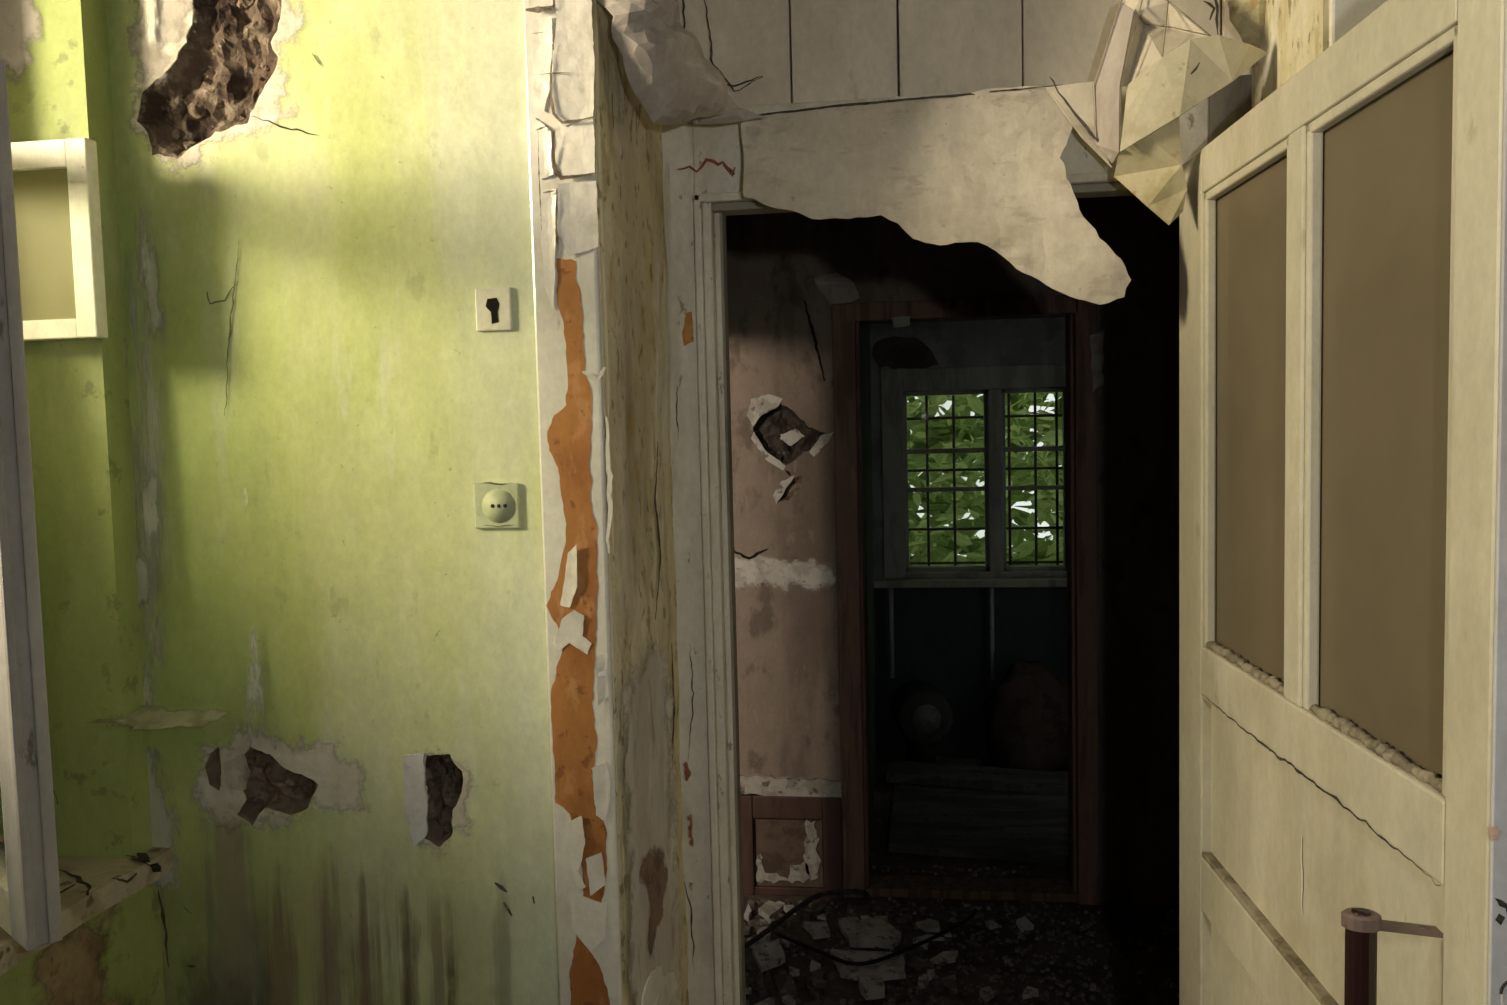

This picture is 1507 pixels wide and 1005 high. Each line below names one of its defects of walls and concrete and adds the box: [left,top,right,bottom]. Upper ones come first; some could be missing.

flaking render [127,0,303,173]
peeling [1045,0,1268,225]
peeling [130,217,163,606]
peeling [526,0,767,1005]
flaking render [747,394,834,504]
peeling [137,749,179,888]
flaking render [192,630,365,832]
flaking render [403,752,471,851]
peeling [755,819,821,884]